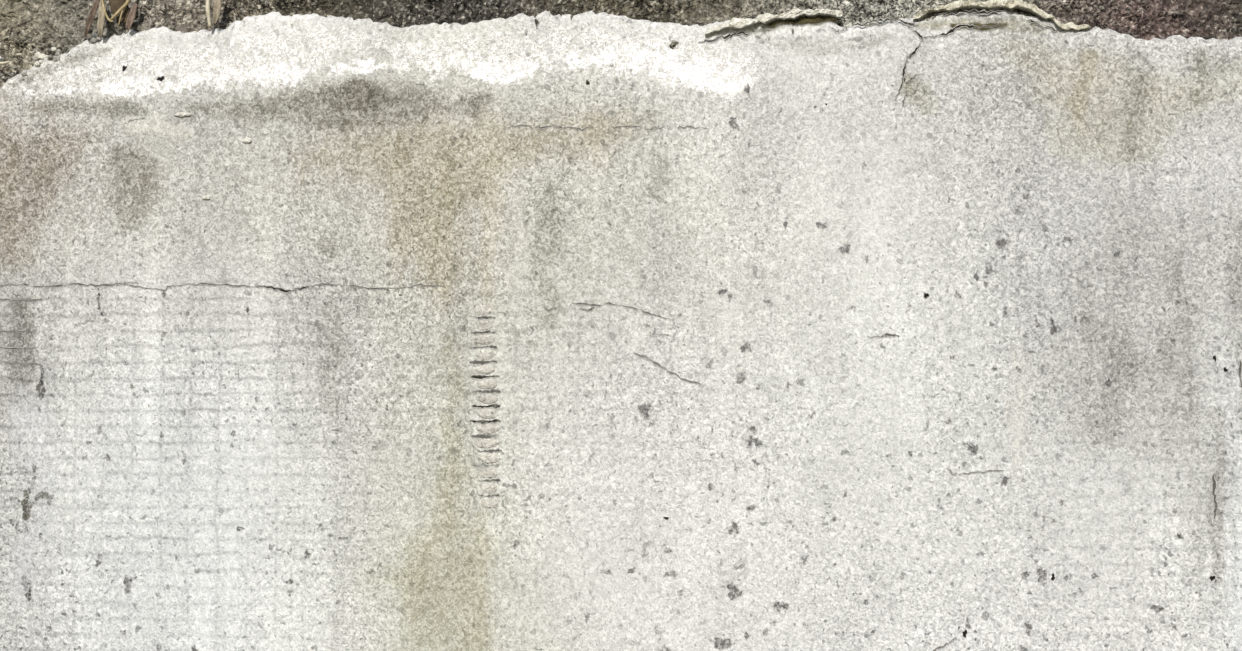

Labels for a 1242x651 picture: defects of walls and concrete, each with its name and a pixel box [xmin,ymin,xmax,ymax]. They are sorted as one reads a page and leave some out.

peeling [0,0,1242,88]
crack [896,23,1001,106]
crack [0,282,442,365]